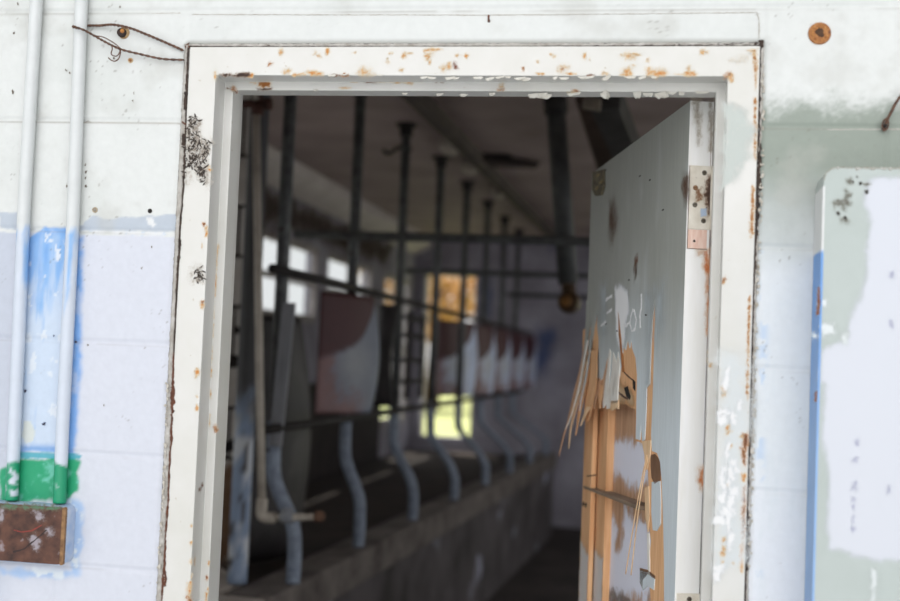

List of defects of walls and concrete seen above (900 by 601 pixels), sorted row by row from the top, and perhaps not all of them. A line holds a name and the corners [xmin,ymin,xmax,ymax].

corrosion [281,46,470,90]